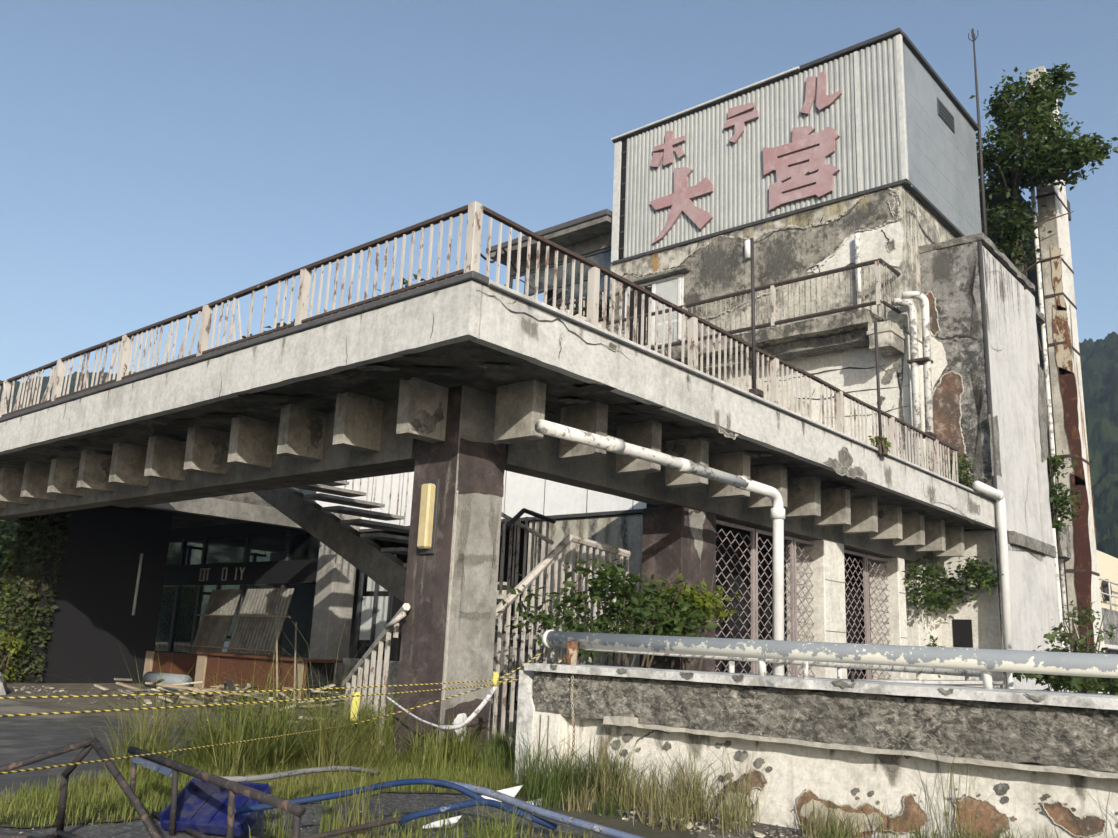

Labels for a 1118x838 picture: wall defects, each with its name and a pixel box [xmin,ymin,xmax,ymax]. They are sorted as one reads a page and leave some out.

crack [754,193,870,243]
flaking render [607,183,913,352]
crack [476,290,632,361]
flaking render [925,289,941,337]
peeling [821,446,868,492]
flaking render [932,367,971,481]
rust [1051,246,1097,652]
flaking render [714,740,773,822]
flaking render [792,788,930,838]
flaking render [946,783,1017,838]
flaking render [1034,794,1118,838]